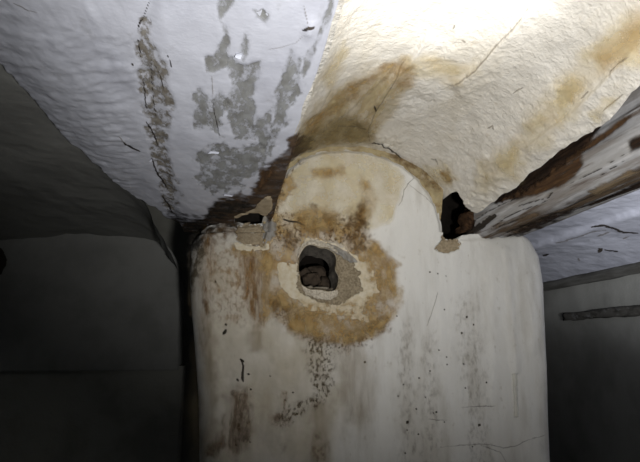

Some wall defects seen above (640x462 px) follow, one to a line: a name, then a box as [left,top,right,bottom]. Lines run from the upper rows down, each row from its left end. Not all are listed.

peeling [219,0,234,17]
peeling [132,2,179,213]
peeling [193,33,310,197]
spalling [234,196,277,251]
water stain [171,64,411,397]
spalling [435,192,474,253]
spalling [277,238,385,326]